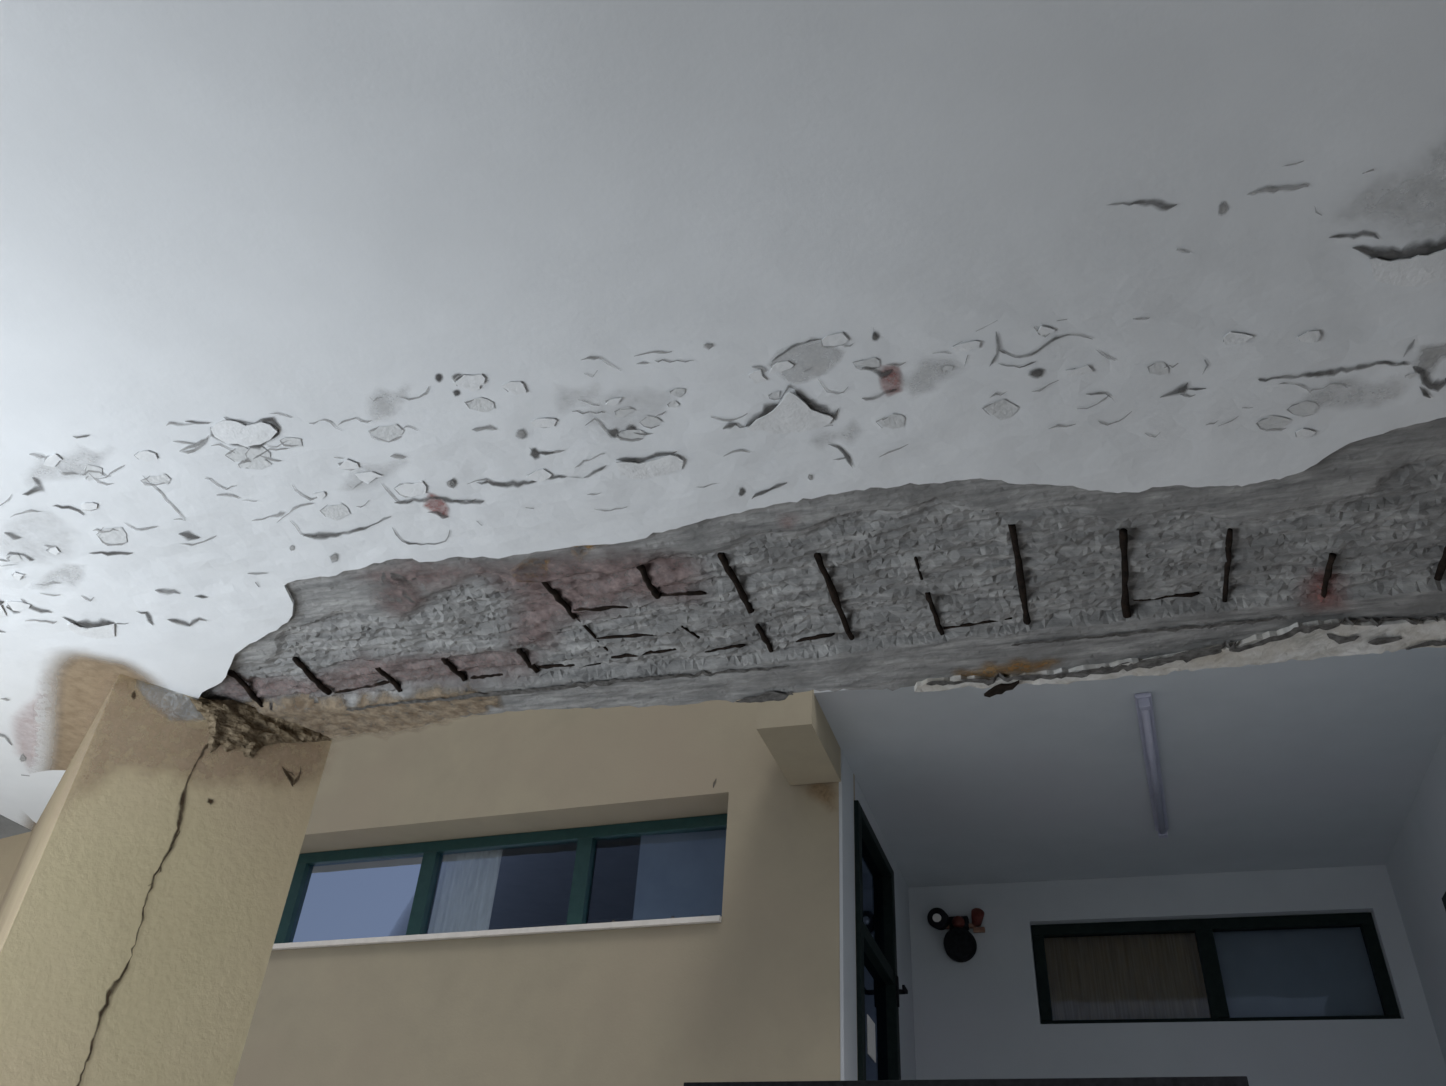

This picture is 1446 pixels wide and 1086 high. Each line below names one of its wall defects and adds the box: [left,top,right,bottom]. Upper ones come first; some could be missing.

peeling [1329,232,1446,287]
peeling [166,422,302,470]
peeling [309,374,527,442]
peeling [572,388,685,441]
peeling [711,332,906,434]
peeling [1206,339,1446,439]
peeling [0,450,216,624]
corrosion [425,494,447,518]
corrosion [222,545,695,698]
spalling [190,417,1446,759]
leakage [48,655,321,779]
crack [77,743,220,1086]